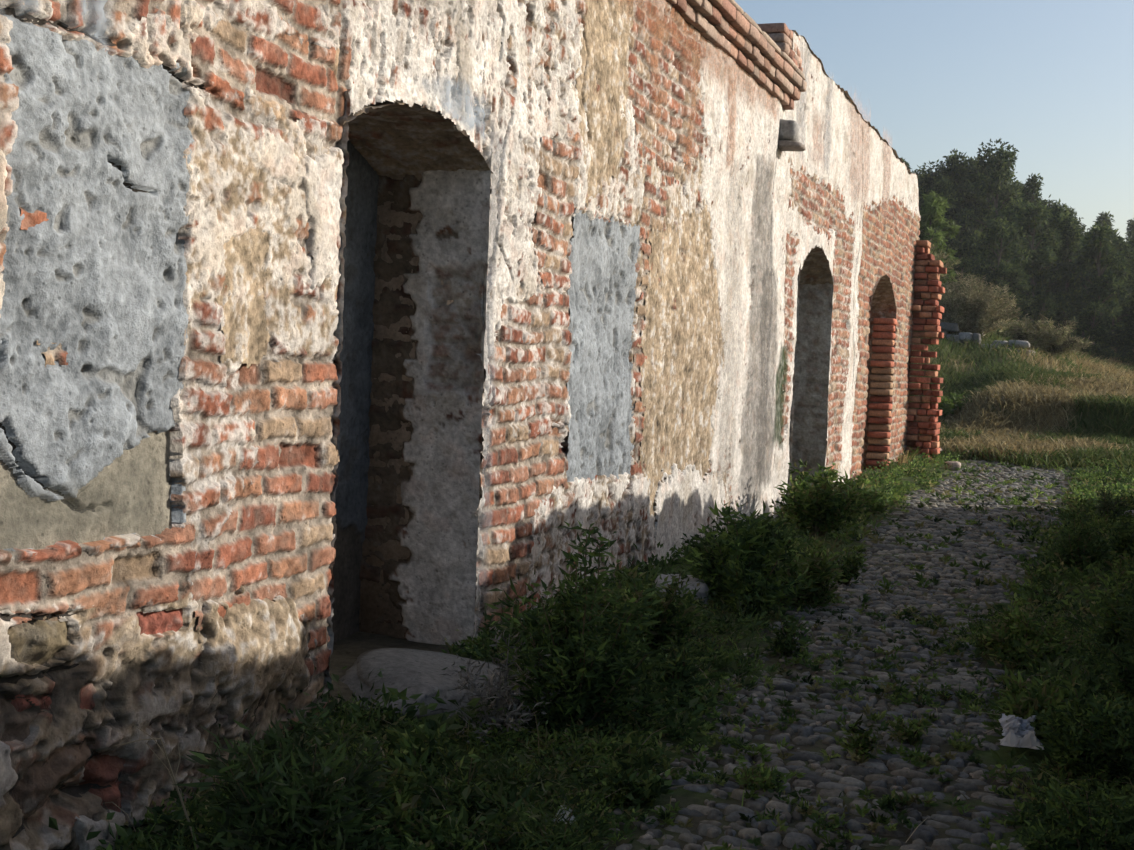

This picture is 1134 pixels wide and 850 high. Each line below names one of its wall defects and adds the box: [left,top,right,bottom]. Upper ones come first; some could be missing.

spalling [49,0,61,21]
crack [0,8,117,46]
crack [162,64,206,91]
spalling [122,0,354,125]
spalling [476,0,725,637]
spalling [778,158,920,481]
flaking render [0,741,18,809]
spalling [72,750,126,850]